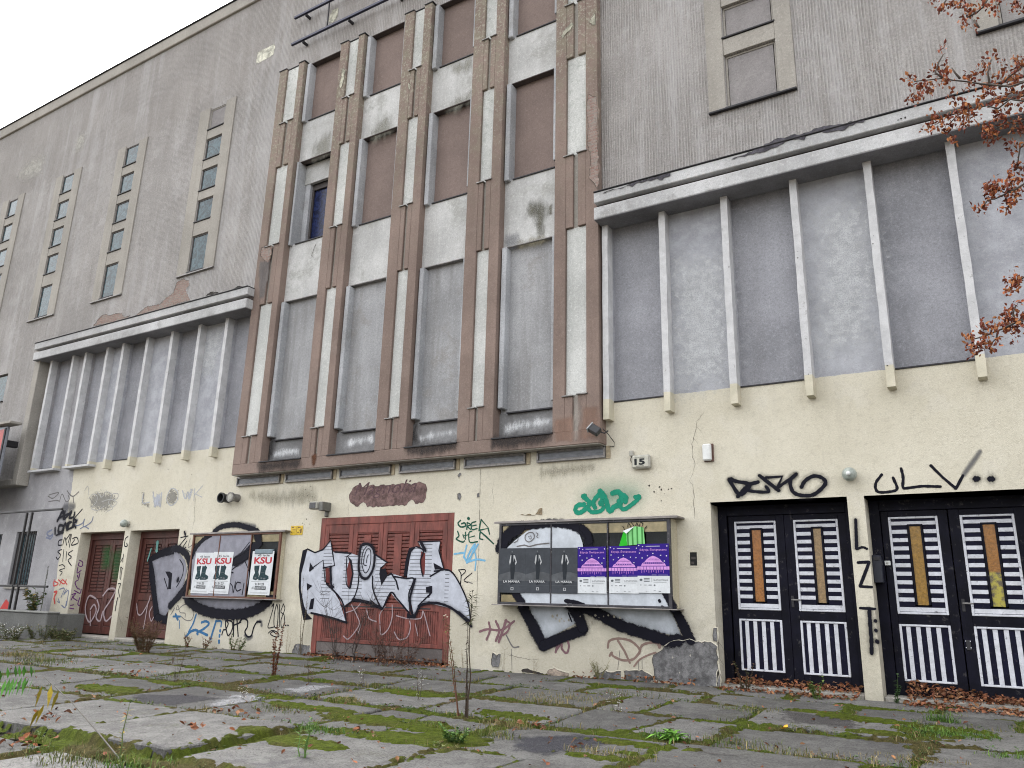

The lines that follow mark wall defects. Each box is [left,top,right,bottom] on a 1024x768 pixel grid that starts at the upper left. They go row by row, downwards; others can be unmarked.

spalling [586,93,670,193]
water stain [528,203,551,244]
spalling [93,279,191,326]
spalling [594,627,722,687]